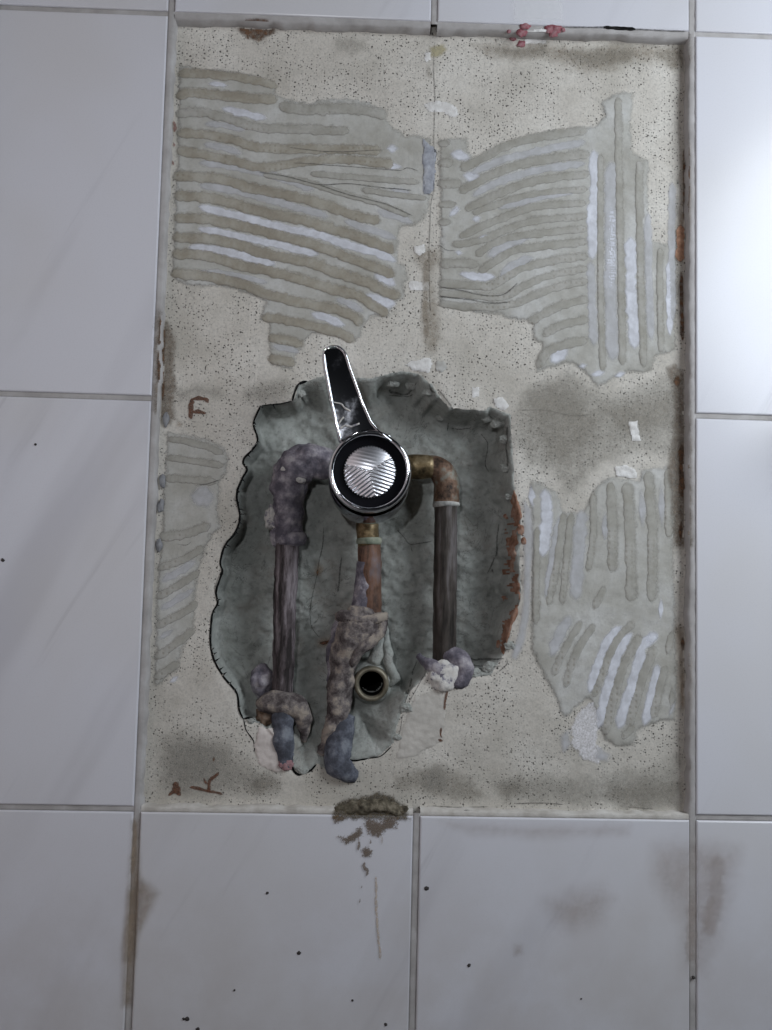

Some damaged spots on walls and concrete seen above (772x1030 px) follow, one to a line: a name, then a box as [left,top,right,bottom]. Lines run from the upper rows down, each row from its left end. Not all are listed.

rust [240,19,274,40]
spalling [211,376,339,732]
spalling [293,479,358,775]
spalling [349,478,435,760]
spalling [356,371,526,678]